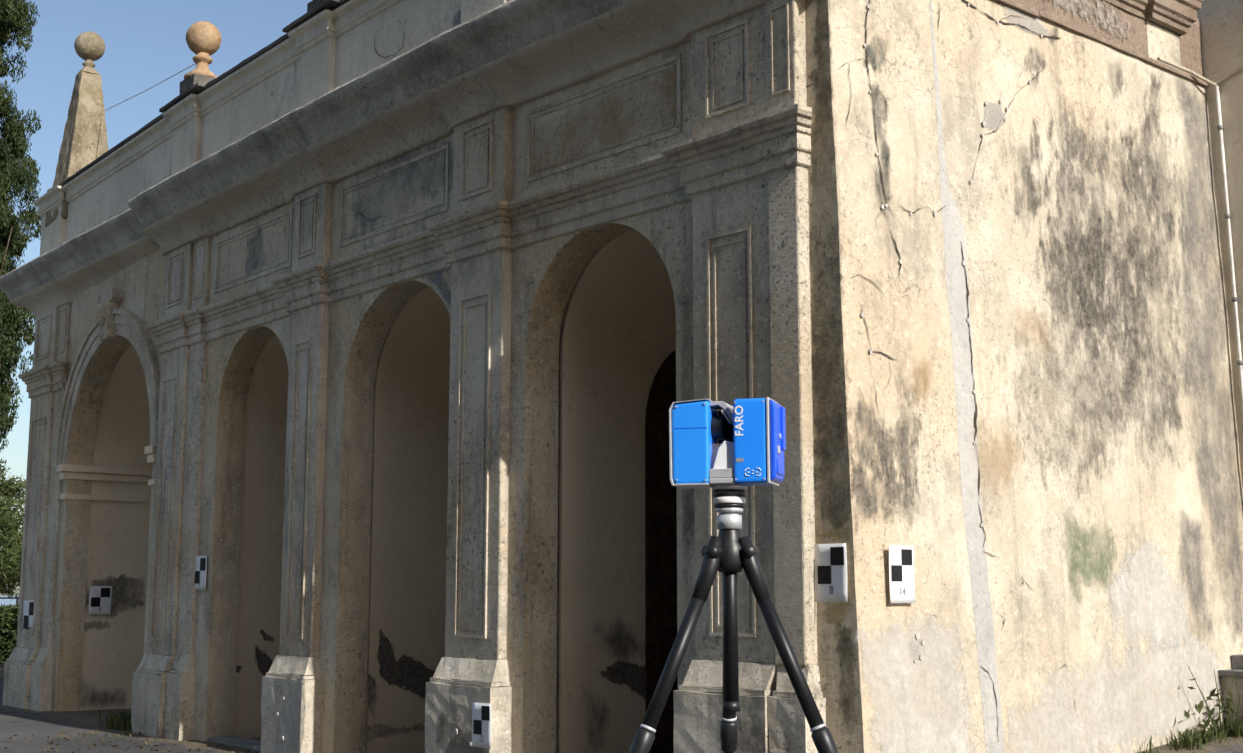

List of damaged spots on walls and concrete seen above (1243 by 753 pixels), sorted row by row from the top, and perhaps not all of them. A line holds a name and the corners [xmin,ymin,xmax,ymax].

crack [938,0,1060,39]
crack [806,1,1041,412]
crack [961,243,1032,589]
damp [1008,89,1242,753]
peeling [367,629,435,730]